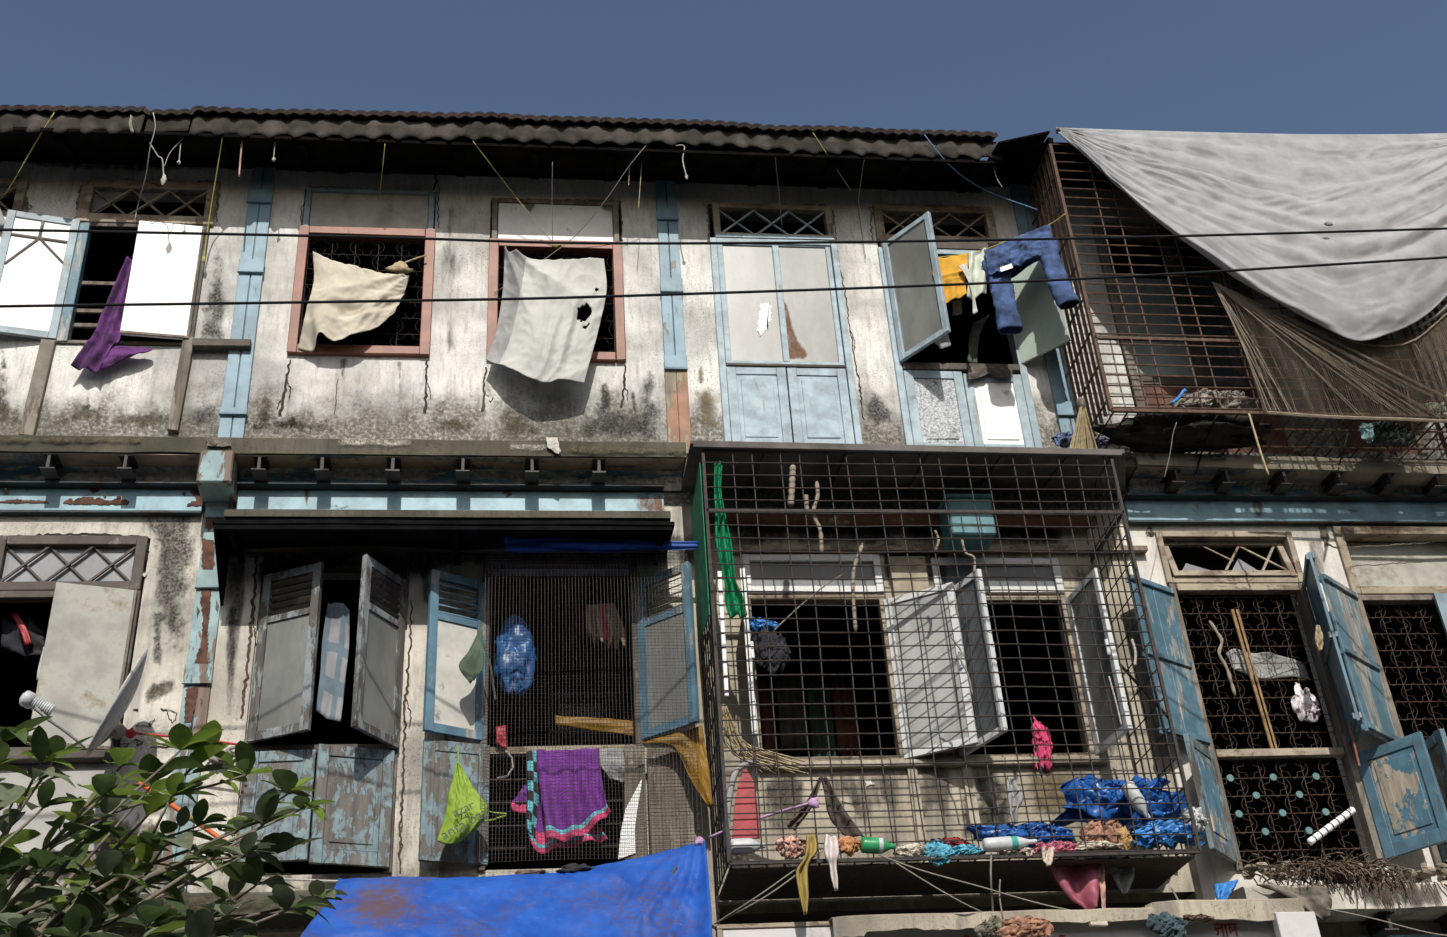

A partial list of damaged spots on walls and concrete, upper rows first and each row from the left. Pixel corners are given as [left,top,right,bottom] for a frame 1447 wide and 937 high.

crack [277,360,291,416]
crack [423,360,431,413]
damp [584,379,656,436]
peeling [0,487,129,505]
damp [148,516,192,662]
crack [240,556,259,717]
damp [146,682,173,700]
peeling [184,686,202,724]
crack [398,600,413,873]